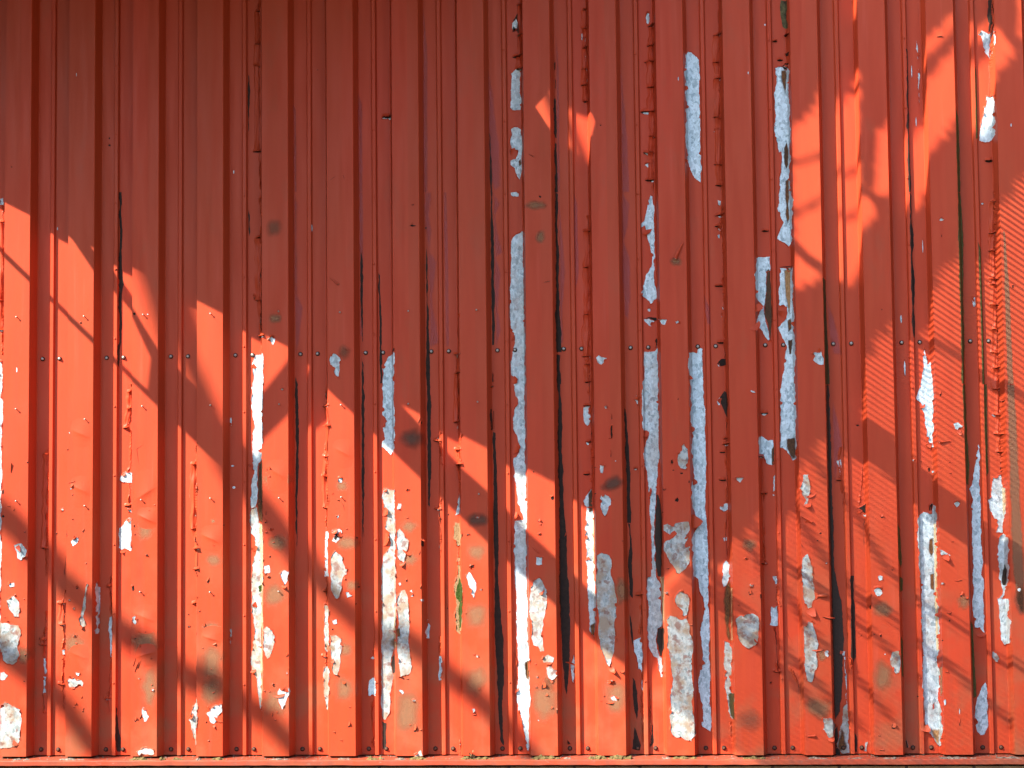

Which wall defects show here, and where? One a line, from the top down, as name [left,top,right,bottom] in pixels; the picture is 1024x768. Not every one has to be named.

peeling [677,51,703,184]
peeling [773,63,795,248]
peeling [0,359,28,681]
peeling [249,335,292,721]
peeling [381,351,396,455]
peeling [367,487,425,721]
peeling [508,230,576,752]
peeling [582,488,624,704]
peeling [632,345,779,742]
peeling [750,256,799,496]
peeling [916,347,963,448]
peeling [916,442,1021,747]